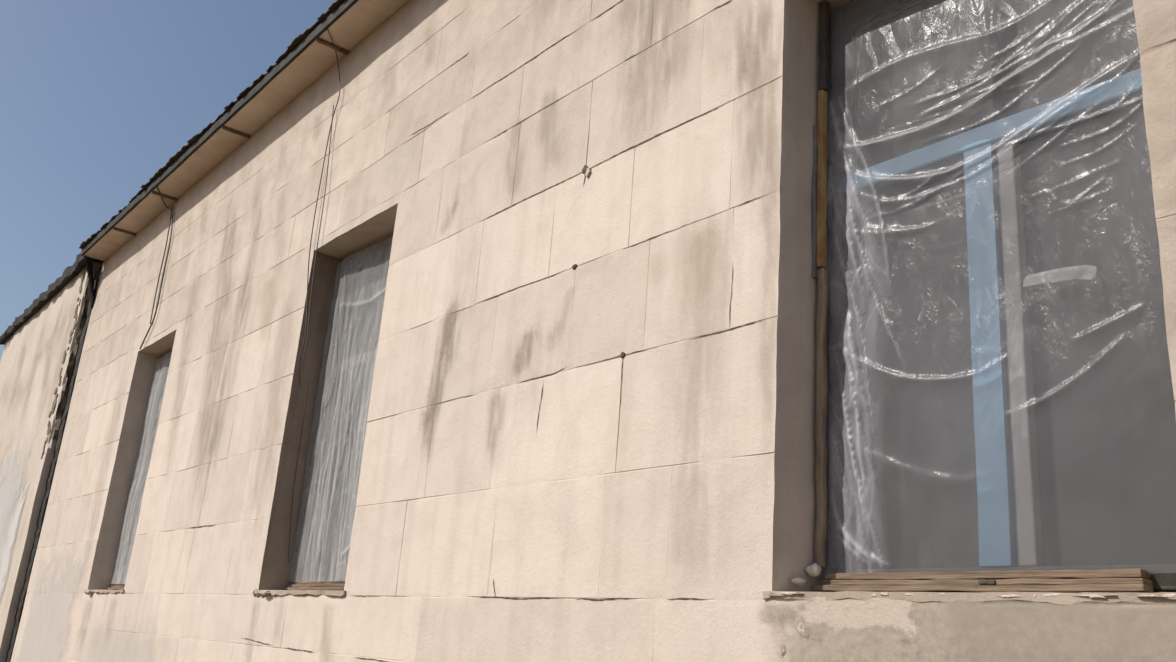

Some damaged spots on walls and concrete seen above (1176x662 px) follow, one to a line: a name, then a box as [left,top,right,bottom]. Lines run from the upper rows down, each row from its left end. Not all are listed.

crack [519,367,566,432]
spalling [765,592,1176,662]